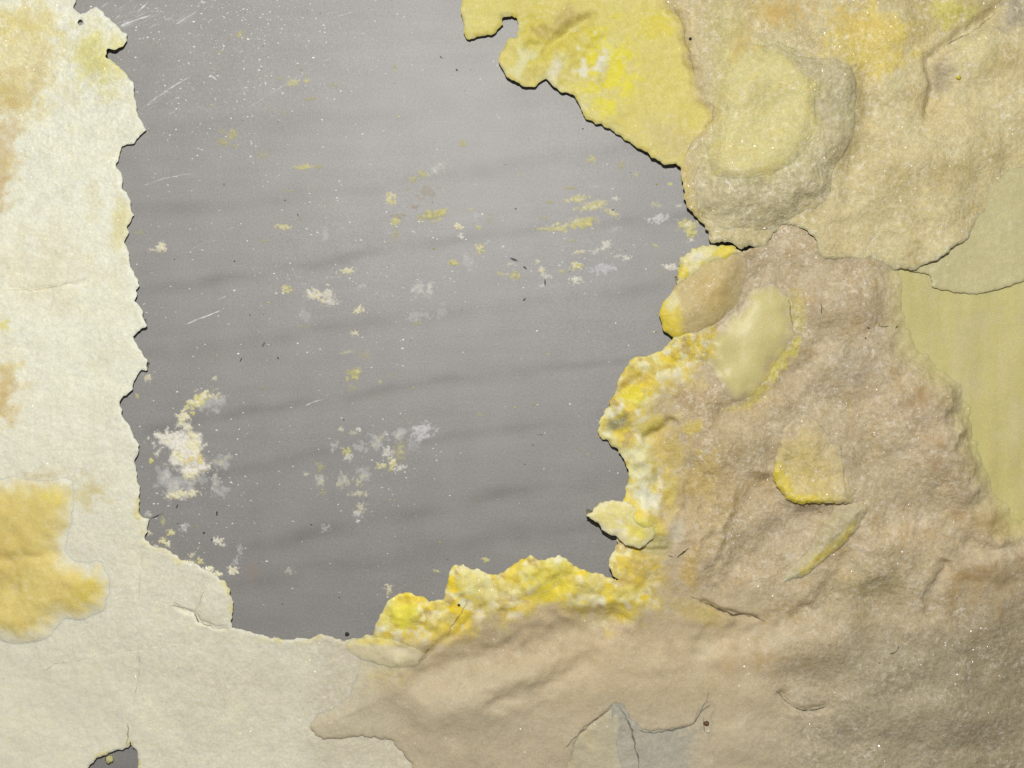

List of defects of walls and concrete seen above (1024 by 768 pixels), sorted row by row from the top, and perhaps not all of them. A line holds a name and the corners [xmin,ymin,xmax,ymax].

peeling [417,208,481,239]
peeling [546,187,618,233]
peeling [644,213,699,239]
peeling [568,250,632,284]
peeling [307,284,335,305]
peeling [147,389,211,501]
peeling [375,446,406,471]
peeling [411,420,437,441]
peeling [586,500,655,548]
peeling [184,557,239,577]